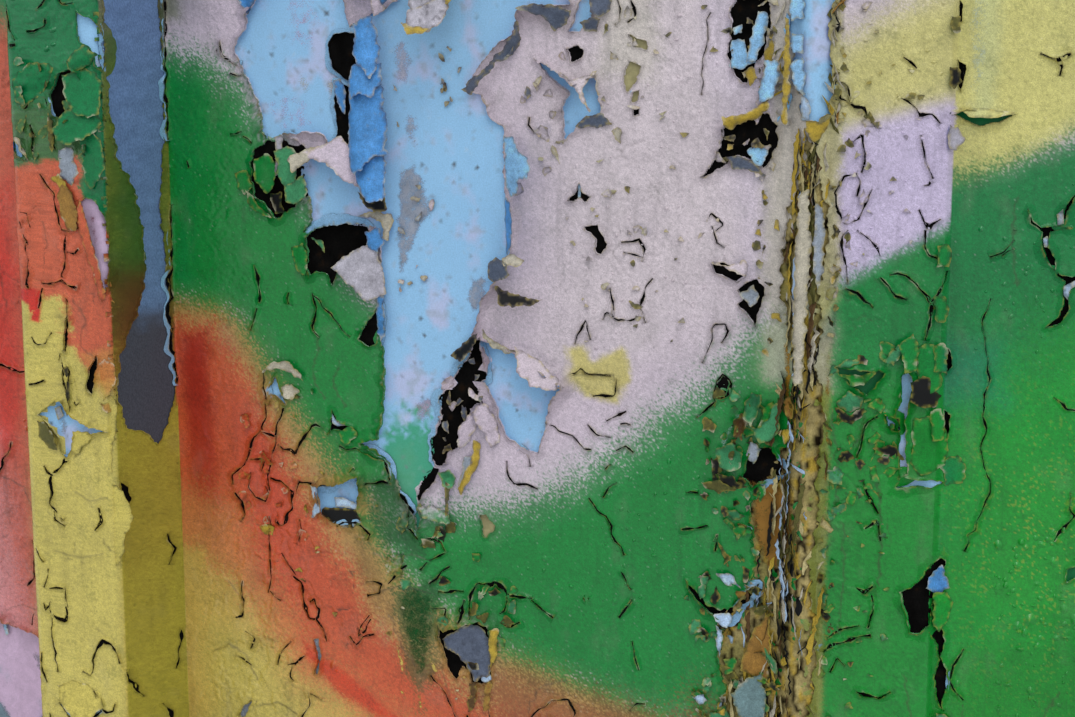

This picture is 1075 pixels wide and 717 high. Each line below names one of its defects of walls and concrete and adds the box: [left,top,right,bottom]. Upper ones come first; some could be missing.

crack [0,97,83,407]
peeling [12,0,179,565]
crack [25,539,177,717]
crack [227,370,592,717]
peeling [228,0,659,548]
peeling [419,584,518,712]
crack [544,235,657,672]
crack [682,575,763,657]
peeling [684,0,904,717]
peeling [926,565,953,631]
peeling [930,405,955,443]
crack [987,190,1075,333]